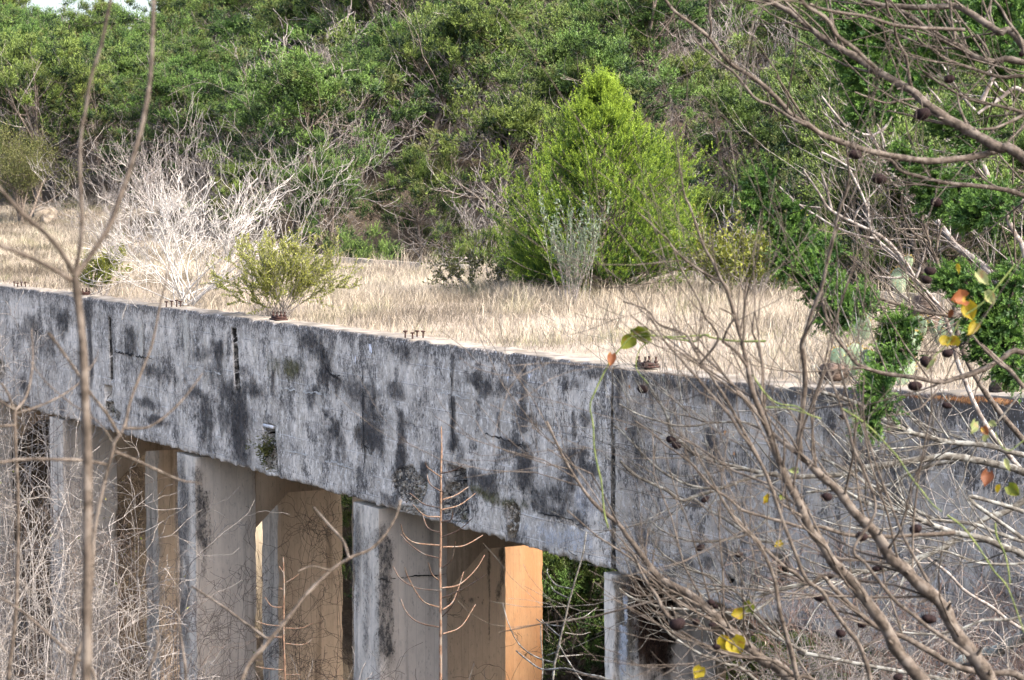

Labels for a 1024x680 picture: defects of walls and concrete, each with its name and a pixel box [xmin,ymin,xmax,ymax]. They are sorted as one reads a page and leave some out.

water stain [20,300,93,385]
water stain [174,452,211,644]
water stain [118,313,274,466]
spalling [263,423,279,473]
water stain [298,331,428,506]
water stain [350,506,395,657]
spalling [392,465,428,515]
water stain [442,355,599,554]